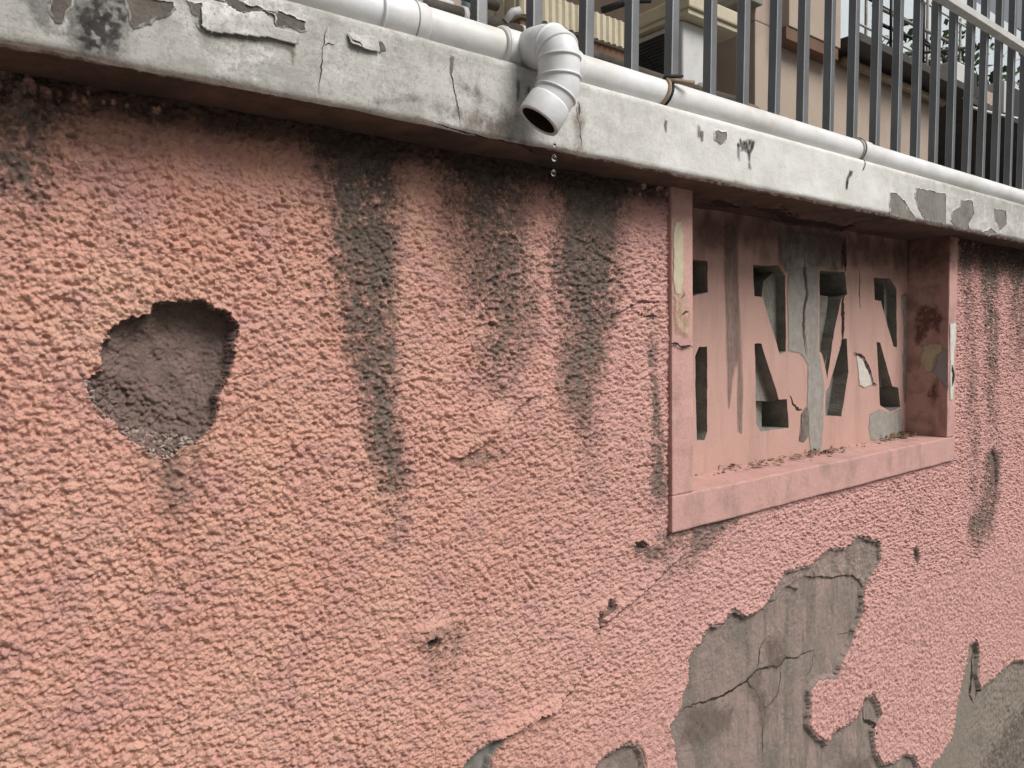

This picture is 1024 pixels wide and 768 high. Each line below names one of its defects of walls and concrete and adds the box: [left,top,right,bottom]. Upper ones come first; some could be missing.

peeling [124,0,308,44]
crack [319,30,363,83]
crack [429,71,583,157]
peeling [889,187,1007,237]
water stain [0,72,668,501]
spalling [81,300,238,461]
peeling [788,263,824,451]
water stain [966,451,1002,548]
crack [684,641,813,747]
crack [805,574,864,635]
flaking render [670,535,1024,768]
flaking render [596,742,646,768]